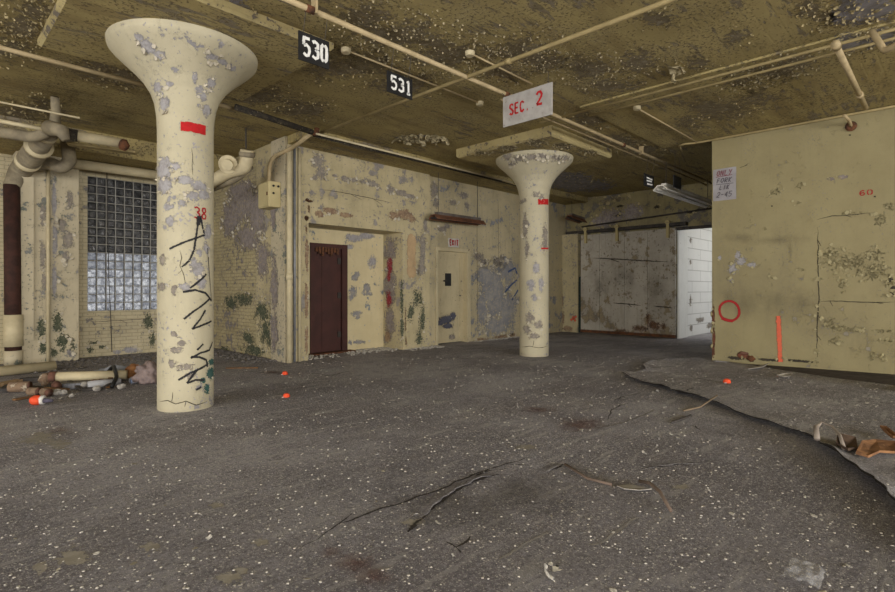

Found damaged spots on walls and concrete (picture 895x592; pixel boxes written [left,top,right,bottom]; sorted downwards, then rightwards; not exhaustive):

peeling [54,54,174,115]
peeling [134,33,166,62]
peeling [466,111,673,229]
peeling [157,179,280,357]
flaking render [308,150,450,348]
peeling [471,192,548,341]
crack [813,213,887,364]
crack [298,457,563,550]